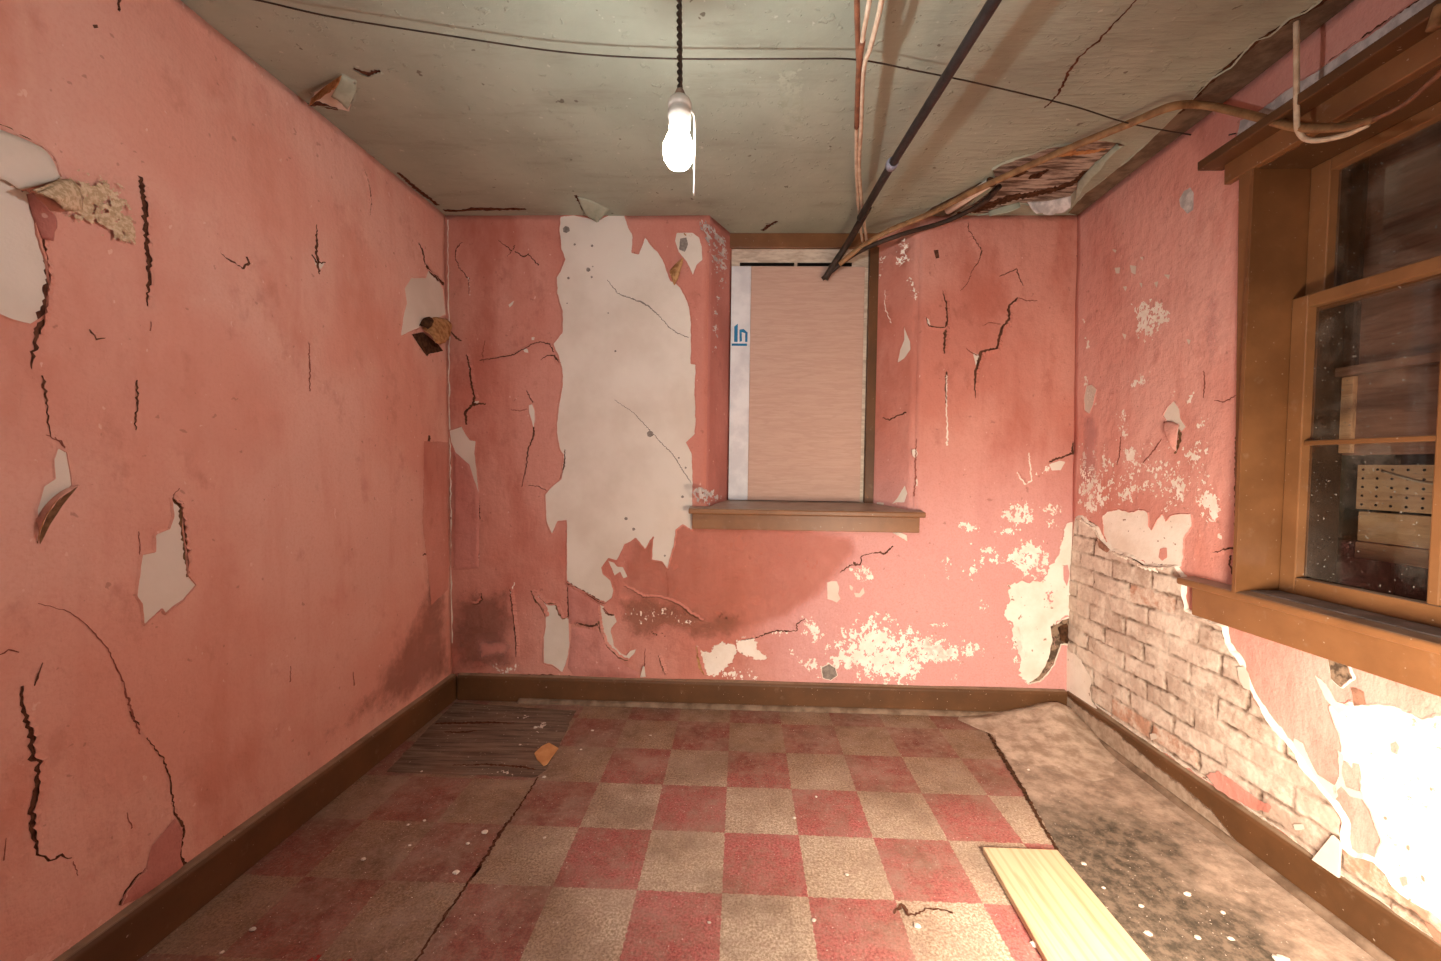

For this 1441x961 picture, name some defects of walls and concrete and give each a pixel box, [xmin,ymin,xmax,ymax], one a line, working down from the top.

crack [1044,0,1137,108]
crack [20,663,78,876]
peeling [34,435,80,544]
peeling [0,124,136,369]
crack [38,603,187,865]
peeling [134,488,197,626]
peeling [449,426,481,518]
peeling [511,195,728,677]
flaking render [789,565,985,685]
crack [883,222,1037,496]
flaking render [1112,249,1170,343]
flaking render [942,391,1441,961]